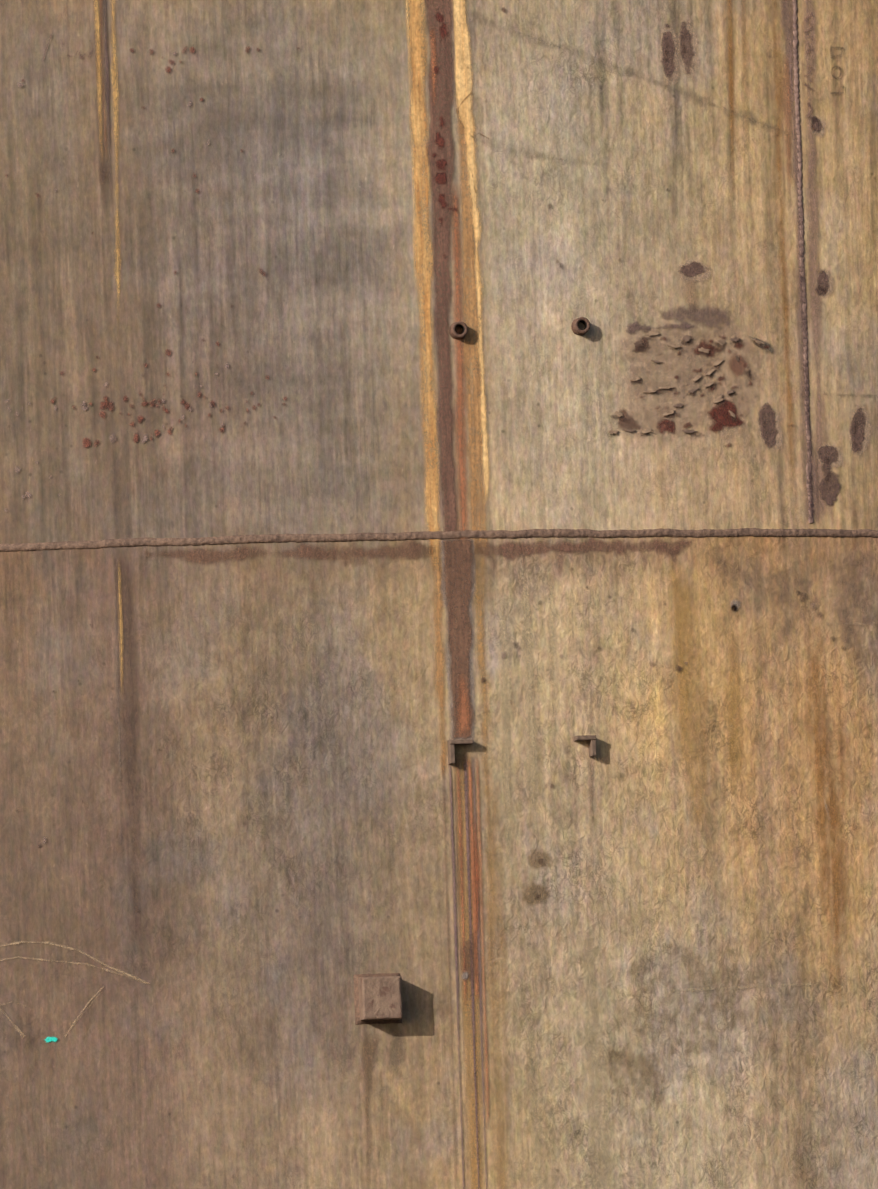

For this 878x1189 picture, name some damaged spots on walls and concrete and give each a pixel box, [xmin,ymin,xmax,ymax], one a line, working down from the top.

rust [661,22,696,81]
rust [778,0,825,516]
peeling [608,308,773,435]
rust [759,403,782,447]
rust [850,408,870,453]
rust [166,547,255,563]
rust [285,0,690,1189]